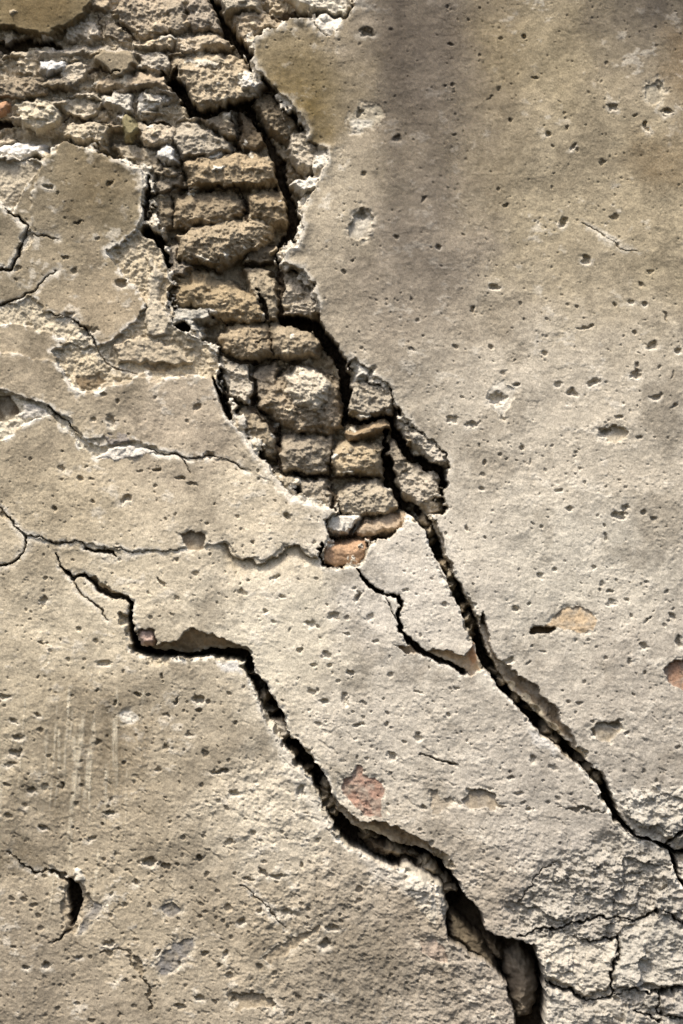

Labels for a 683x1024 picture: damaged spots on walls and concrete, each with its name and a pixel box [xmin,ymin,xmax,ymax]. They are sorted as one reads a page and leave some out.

crack [0,208,60,272]
crack [582,223,638,253]
spalling [0,0,451,572]
crack [0,270,139,375]
crack [48,405,79,434]
crack [212,377,232,421]
crack [137,446,249,474]
spalling [530,606,598,635]
crack [356,498,683,886]
spalling [664,660,683,691]
crack [0,506,547,1024]
spalling [341,764,386,818]